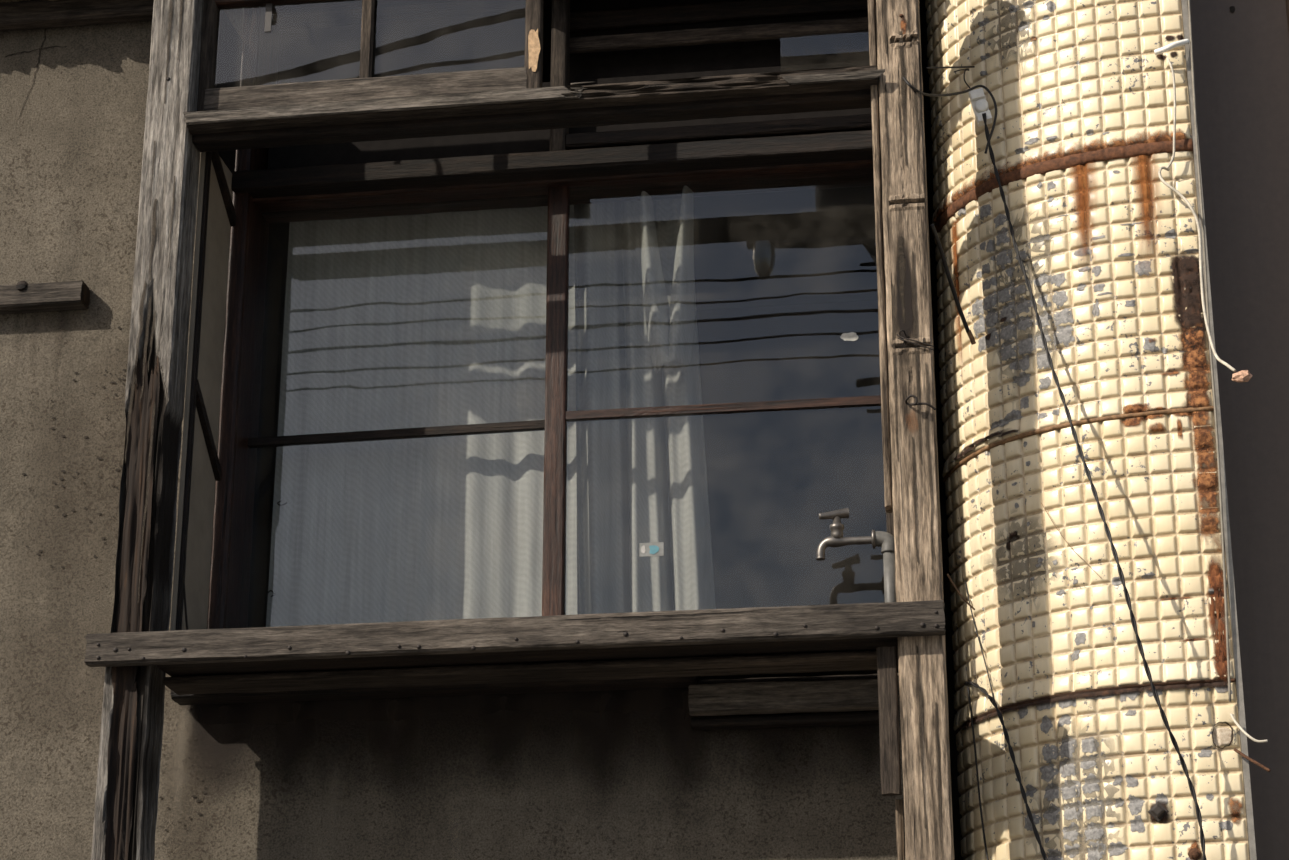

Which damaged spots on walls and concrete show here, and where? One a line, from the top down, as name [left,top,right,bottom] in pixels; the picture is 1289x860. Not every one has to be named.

peeling [1008,0,1056,31]
peeling [979,18,990,76]
peeling [1015,136,1057,154]
peeling [1036,181,1078,217]
corrosion [933,131,1186,332]
peeling [1165,229,1199,254]
peeling [1118,253,1151,276]
peeling [958,204,1111,430]
peeling [1143,337,1168,354]
corrosion [952,255,1228,729]
peeling [1071,632,1085,661]
peeling [1018,685,1228,860]